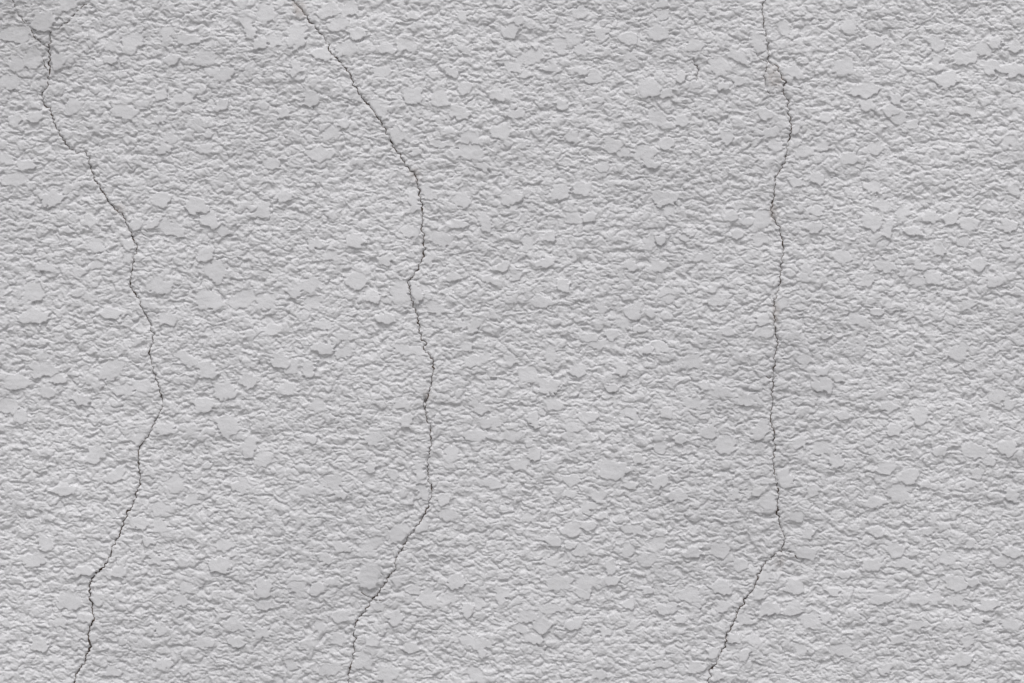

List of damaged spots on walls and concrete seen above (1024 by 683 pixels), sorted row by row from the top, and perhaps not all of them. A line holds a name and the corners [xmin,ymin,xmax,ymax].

crack [12,0,163,683]
crack [292,0,435,683]
crack [707,0,797,683]